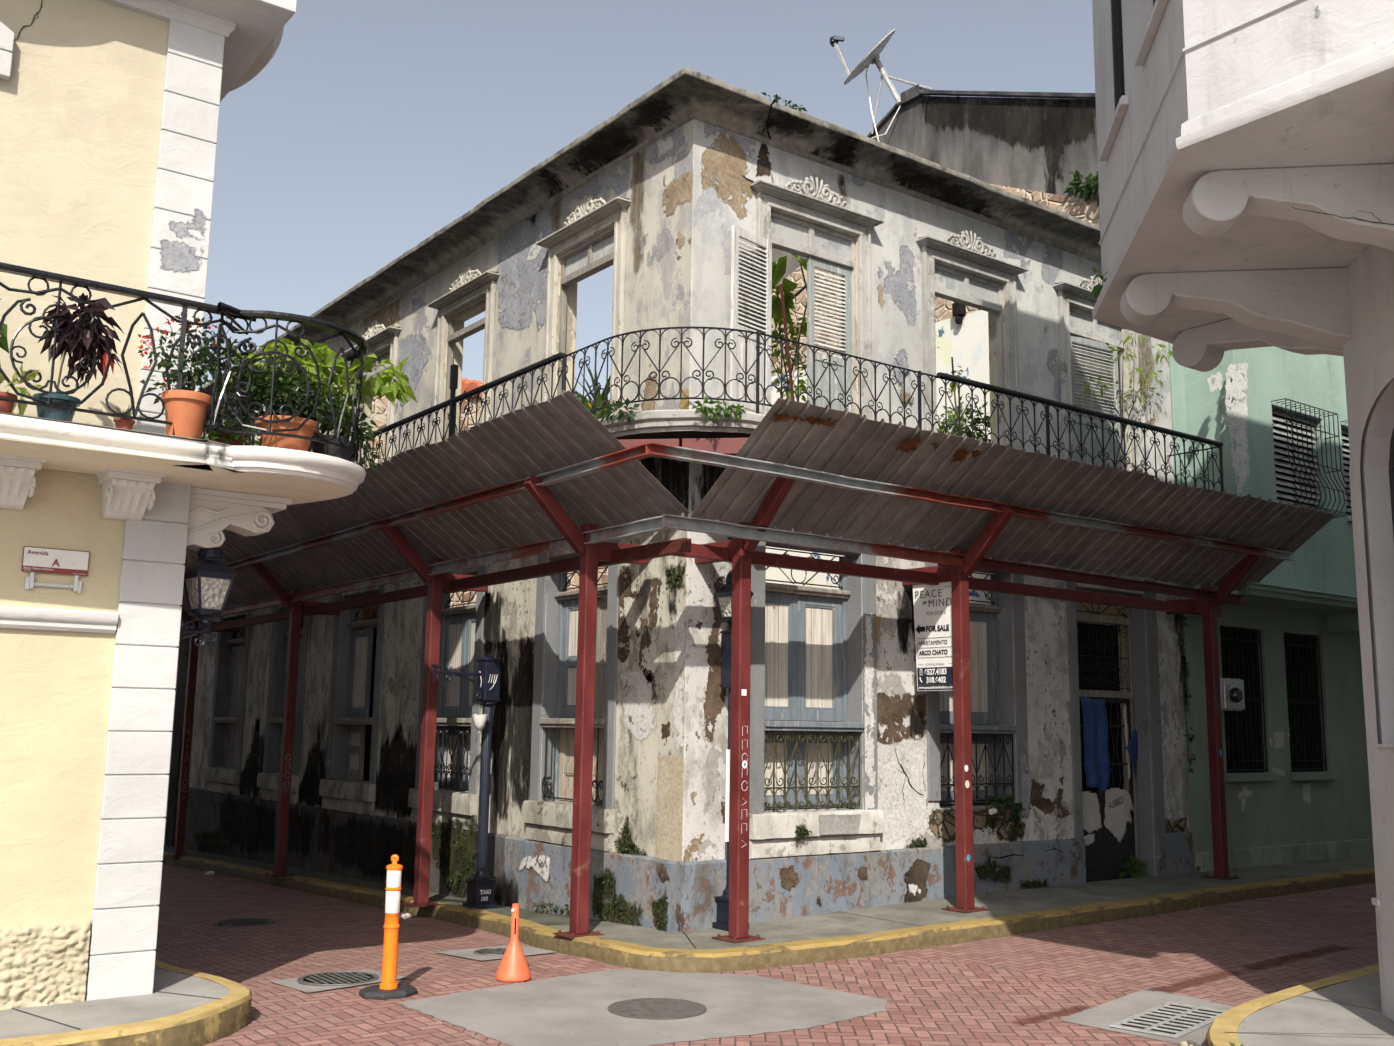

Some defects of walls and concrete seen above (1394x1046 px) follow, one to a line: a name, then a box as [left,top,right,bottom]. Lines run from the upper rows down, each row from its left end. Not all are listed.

peeling [159,208,207,272]
water stain [527,94,672,272]
peeling [497,123,772,338]
water stain [759,108,862,197]
water stain [922,96,1096,194]
crack [1292,207,1394,225]
peeling [1207,362,1250,496]
mould [218,718,417,887]
mould [483,586,534,822]
flaking render [618,565,730,752]
peeling [864,614,956,843]
spalling [903,858,930,903]